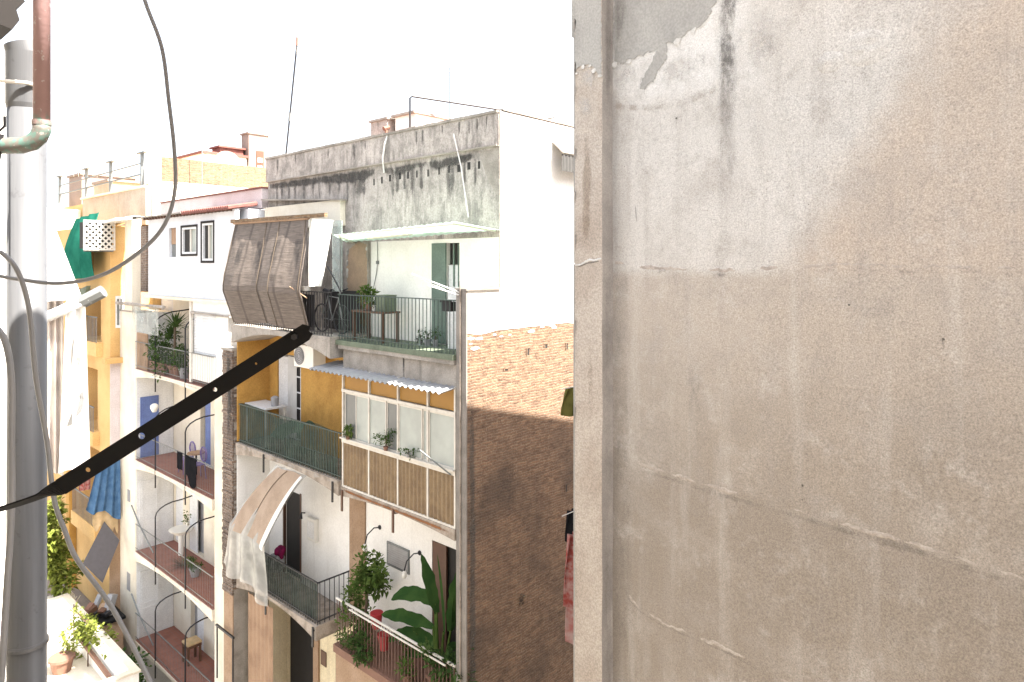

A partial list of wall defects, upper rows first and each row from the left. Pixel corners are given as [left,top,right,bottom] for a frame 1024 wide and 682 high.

peeling [574,0,717,109]
leakage [271,154,476,198]
crack [638,463,737,494]
crack [836,522,1024,580]
crack [629,595,788,682]